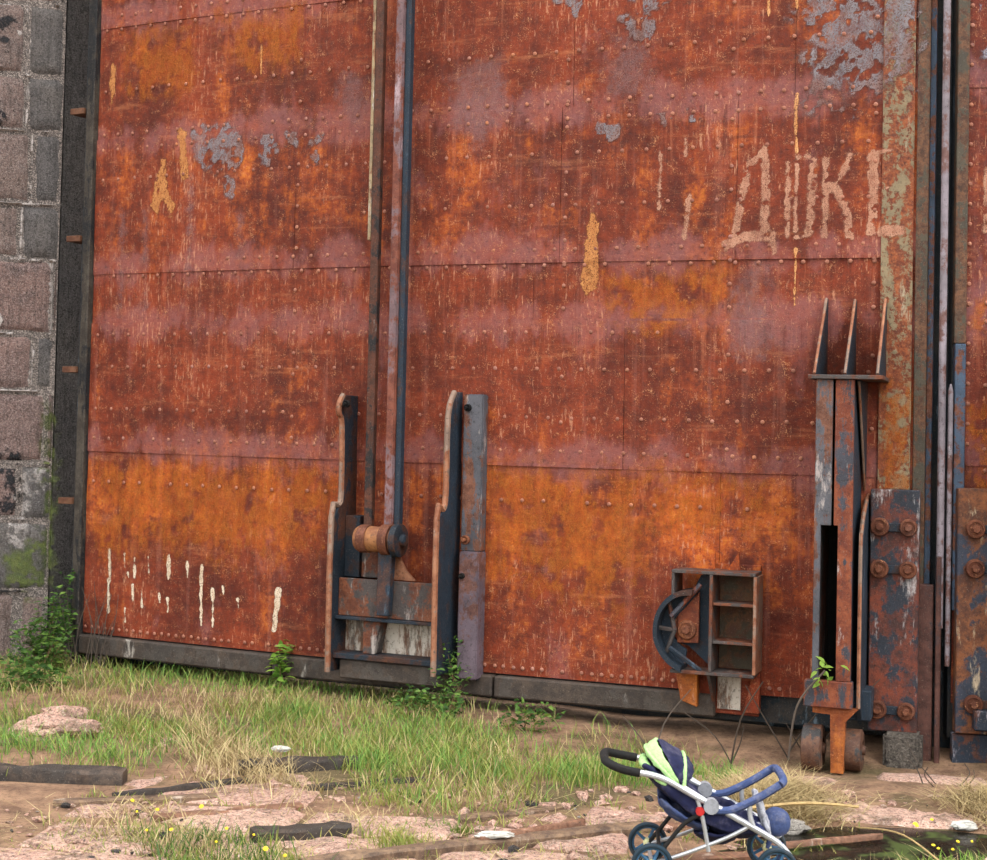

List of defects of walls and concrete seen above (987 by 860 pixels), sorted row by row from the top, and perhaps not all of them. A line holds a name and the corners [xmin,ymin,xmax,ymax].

water stain [0,1,29,43]
water stain [0,35,34,164]
peeling [150,159,175,214]
peeling [177,123,244,198]
peeling [259,131,325,167]
peeling [788,0,929,117]
water stain [0,182,62,334]
water stain [0,448,46,548]